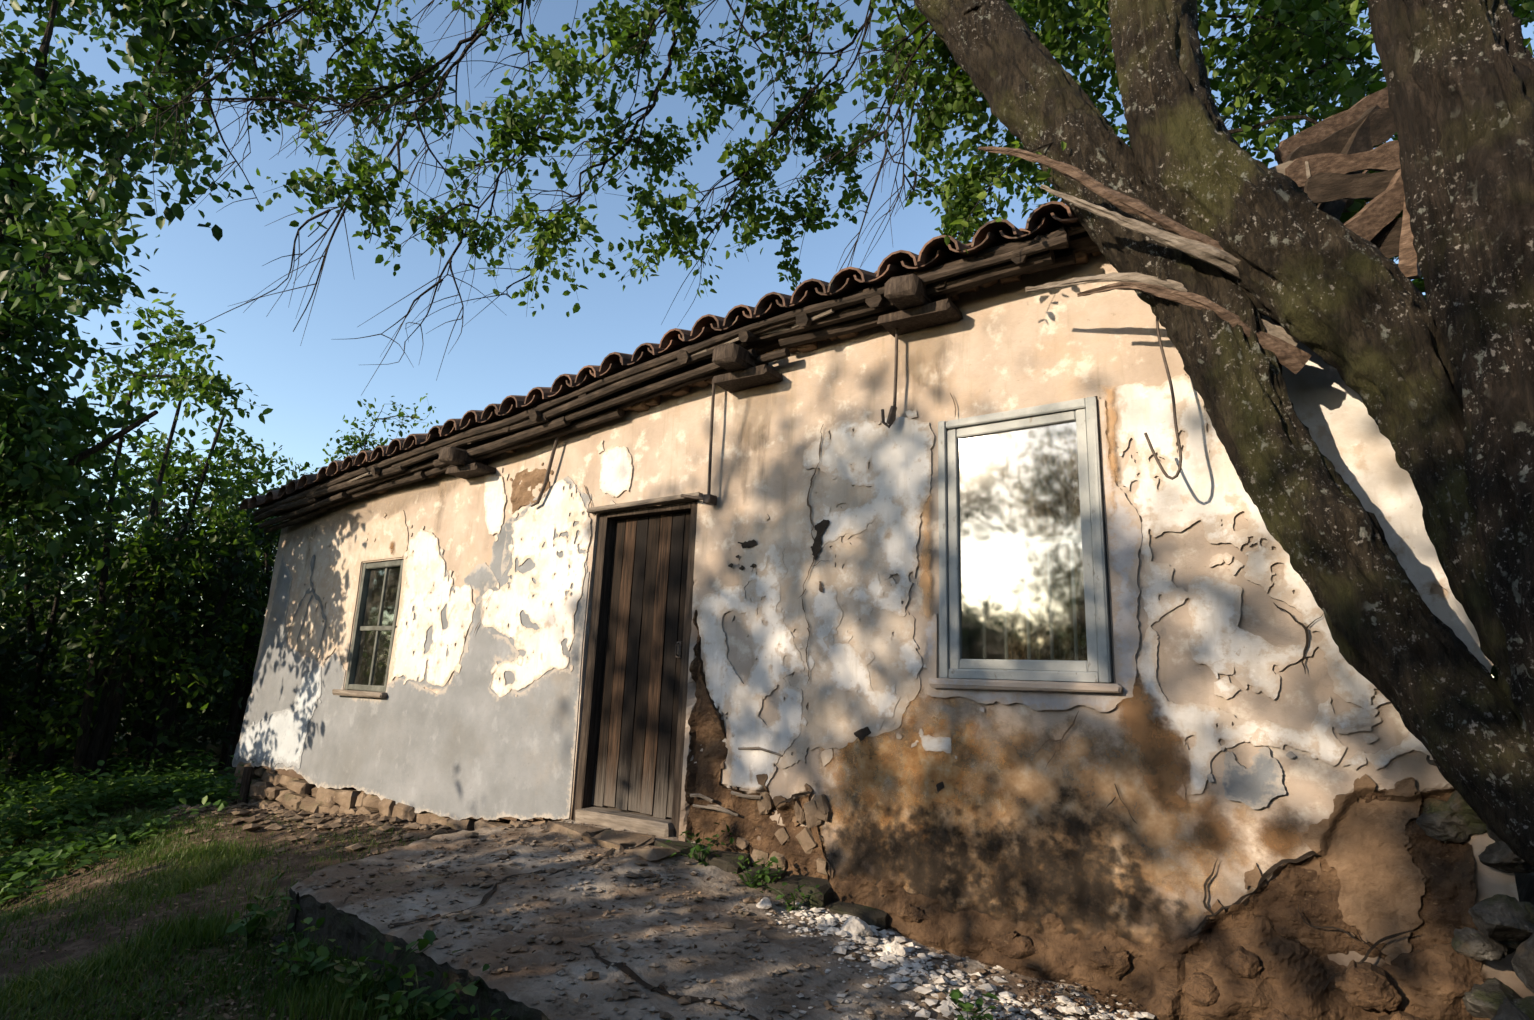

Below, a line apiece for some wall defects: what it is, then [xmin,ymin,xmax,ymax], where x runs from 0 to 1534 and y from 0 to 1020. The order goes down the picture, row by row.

flaking render [232,440,634,821]
crack [800,424,830,684]
flaking render [684,410,957,882]
leakage [820,678,1248,943]
flaking render [1114,373,1478,986]
crack [1273,602,1324,674]
flaking render [1281,341,1493,673]